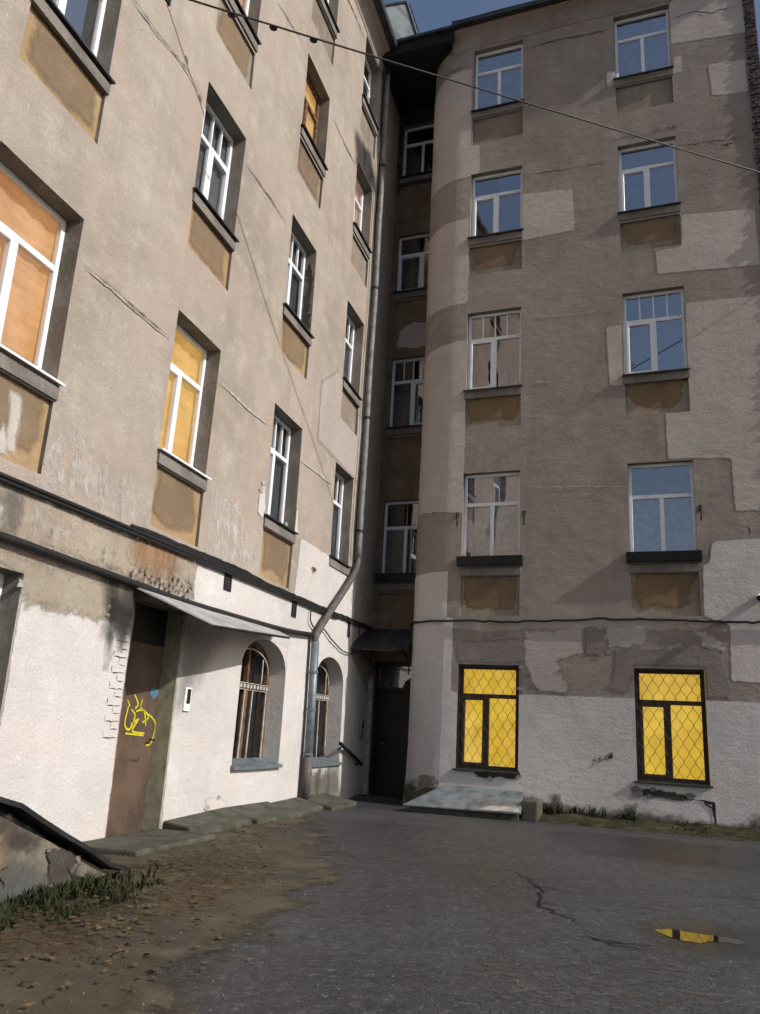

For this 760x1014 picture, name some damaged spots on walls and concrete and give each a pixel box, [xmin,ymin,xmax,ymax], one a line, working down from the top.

crack [526,30,605,49]
crack [677,138,744,147]
peeling [458,628,585,696]
peeling [605,625,733,699]
flaking render [631,786,695,801]